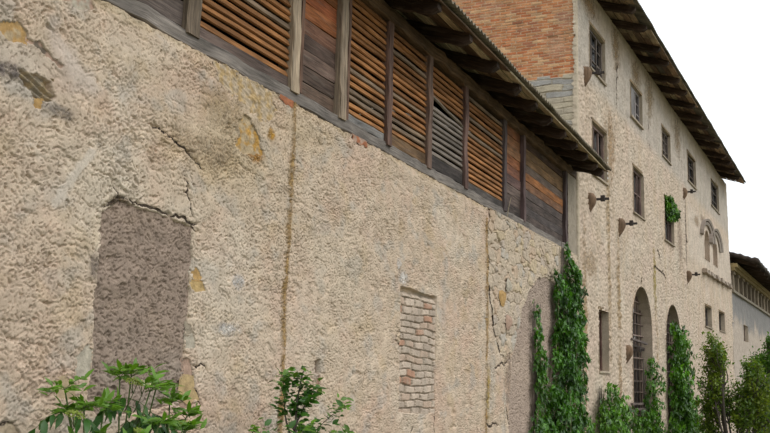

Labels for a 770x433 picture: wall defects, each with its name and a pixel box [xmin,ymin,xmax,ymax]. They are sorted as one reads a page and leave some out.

flaking render [0,21,63,68]
flaking render [18,68,54,109]
crack [102,127,203,232]
flaking render [189,267,205,293]
flaking render [178,321,199,408]